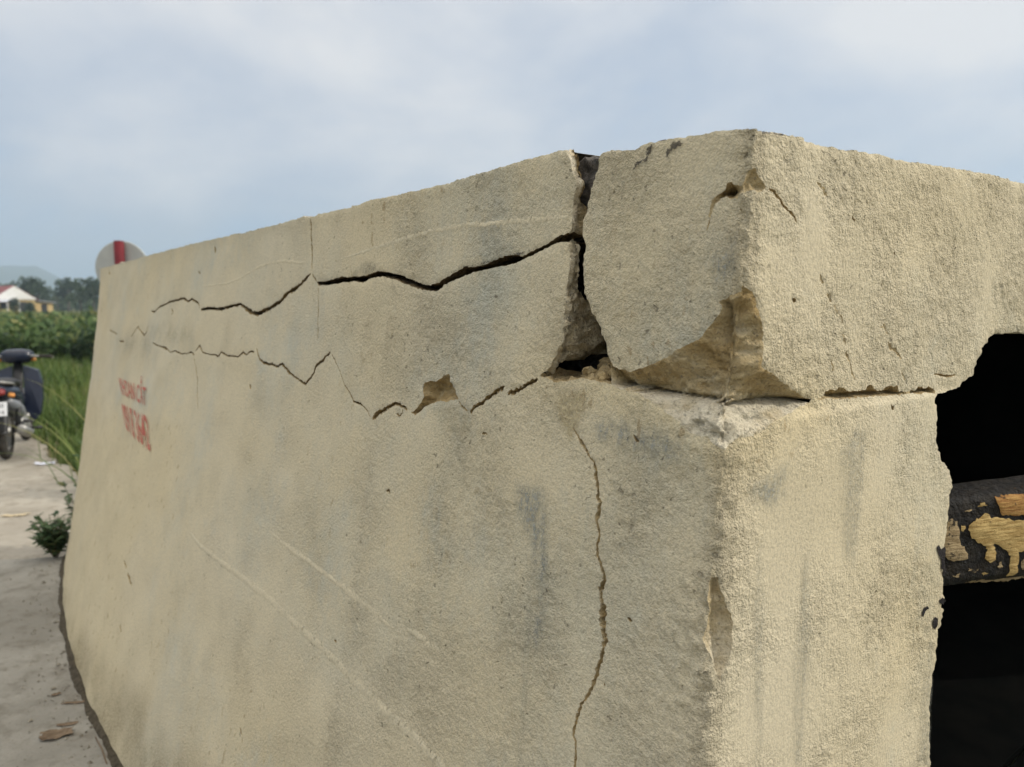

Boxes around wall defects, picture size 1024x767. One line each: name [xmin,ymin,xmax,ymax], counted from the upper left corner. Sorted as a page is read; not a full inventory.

crack [769,189,797,223]
spalling [411,374,458,415]
spalling [611,285,808,449]
crack [110,149,612,767]
peeling [937,494,1024,583]
spalling [702,577,733,681]